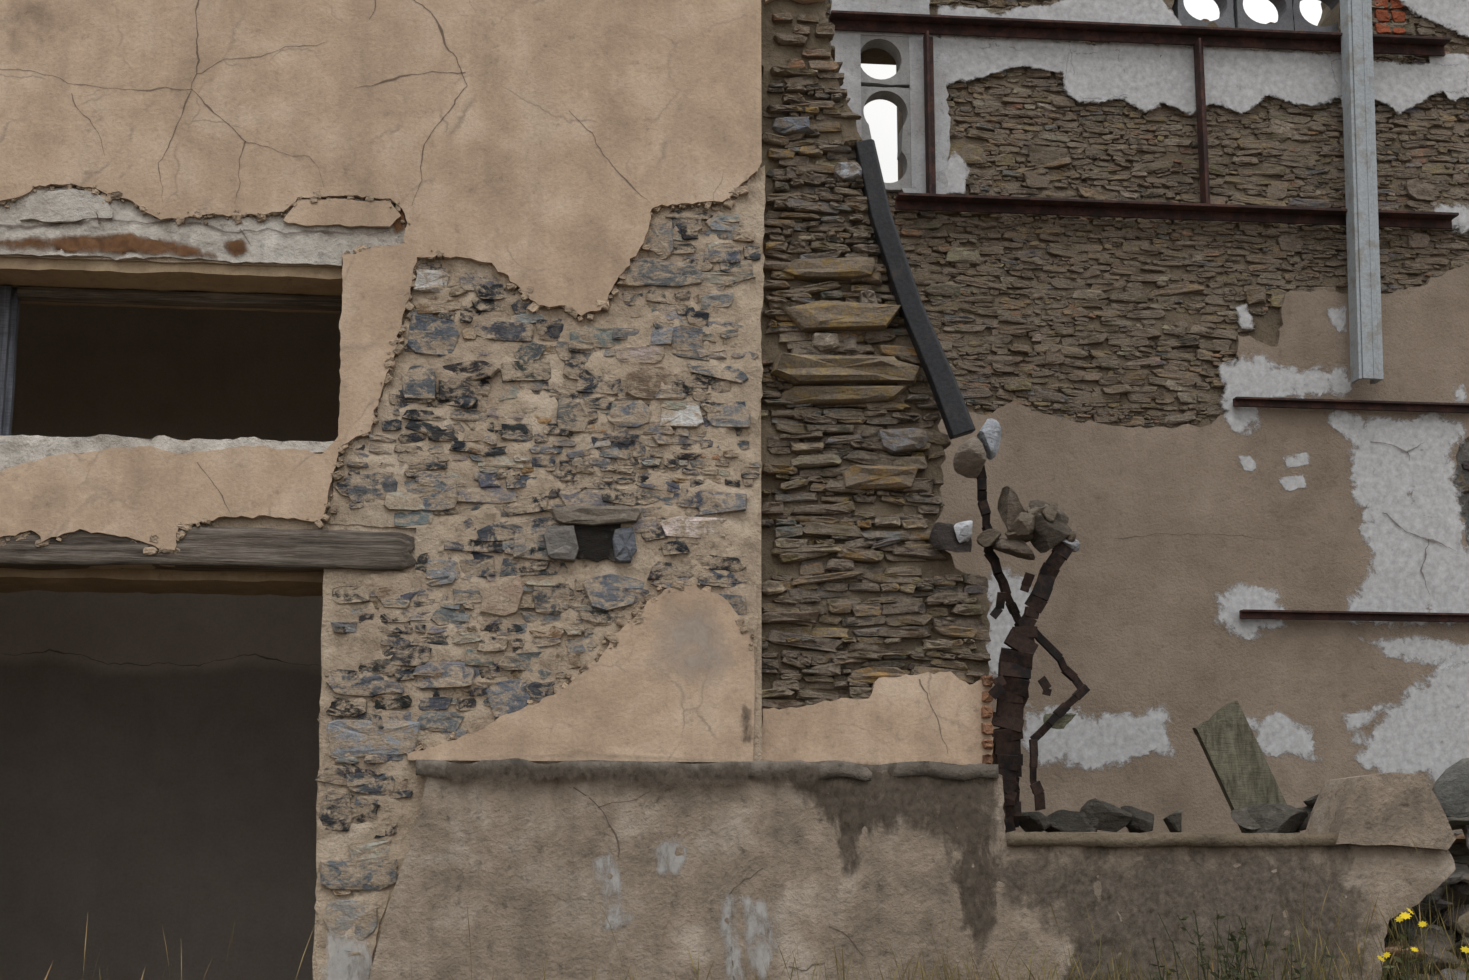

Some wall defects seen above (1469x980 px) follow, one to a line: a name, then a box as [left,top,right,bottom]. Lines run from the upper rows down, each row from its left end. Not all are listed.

crack [0,0,468,245]
peeling [830,0,1181,25]
peeling [830,30,1343,194]
peeling [1373,0,1469,114]
peeling [1435,204,1469,233]
peeling [1236,304,1253,329]
peeling [1327,307,1347,333]
flaking render [0,165,766,980]
peeling [986,569,1031,677]
peeling [1216,354,1469,785]
peeling [1021,705,1175,770]
water stain [422,761,997,941]